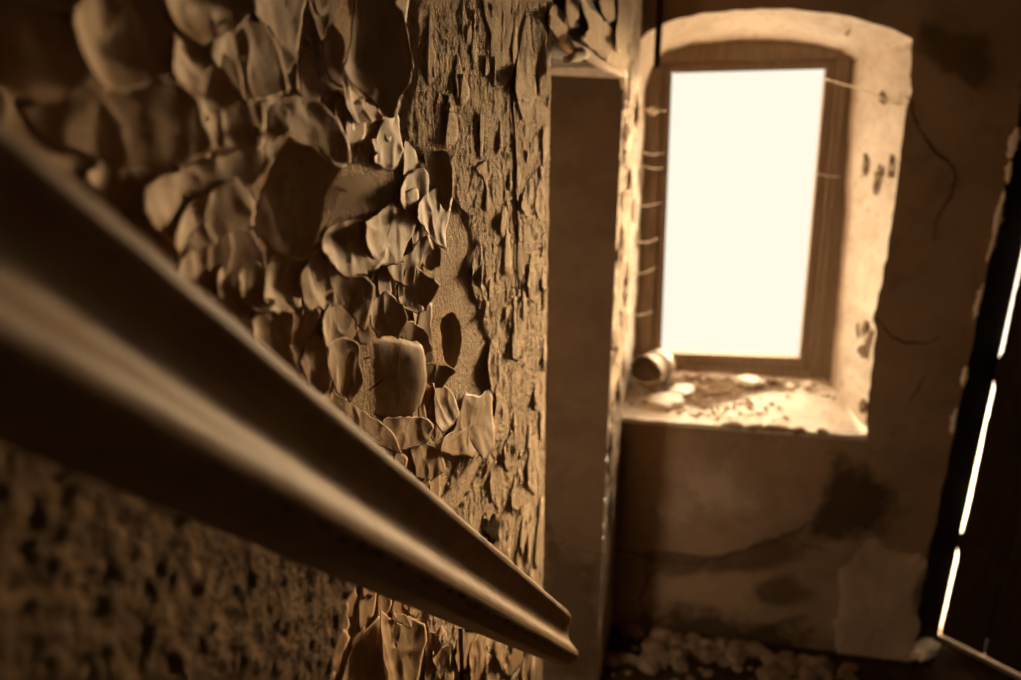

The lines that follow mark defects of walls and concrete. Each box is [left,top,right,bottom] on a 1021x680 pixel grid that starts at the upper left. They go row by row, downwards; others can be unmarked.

peeling [483,0,640,153]
crack [906,96,957,239]
peeling [0,0,545,577]
damp [812,459,892,540]
peeling [341,610,542,680]